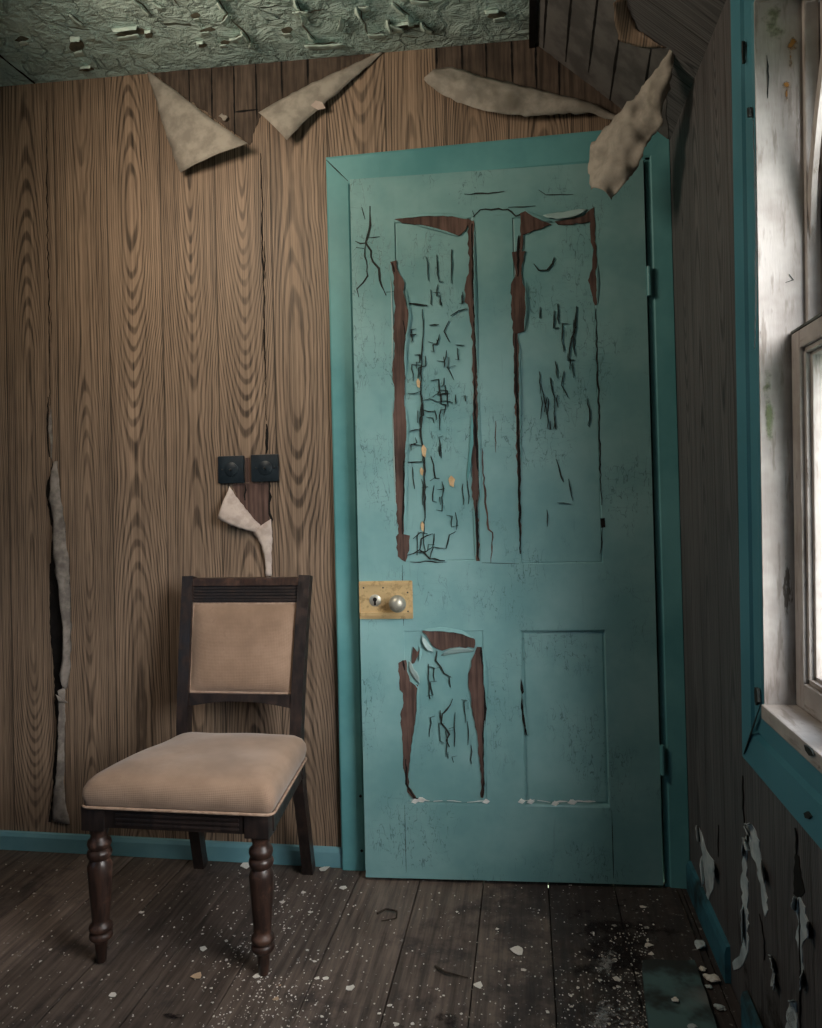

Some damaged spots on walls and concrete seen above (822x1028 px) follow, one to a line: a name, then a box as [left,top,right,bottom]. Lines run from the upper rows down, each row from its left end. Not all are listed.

crack [132,0,179,17]
crack [213,0,255,50]
crack [292,0,434,50]
peeling [390,213,482,562]
peeling [510,207,600,550]
peeling [398,627,490,804]
peeling [695,825,715,900]
peeling [732,822,768,970]
peeling [785,828,809,1028]